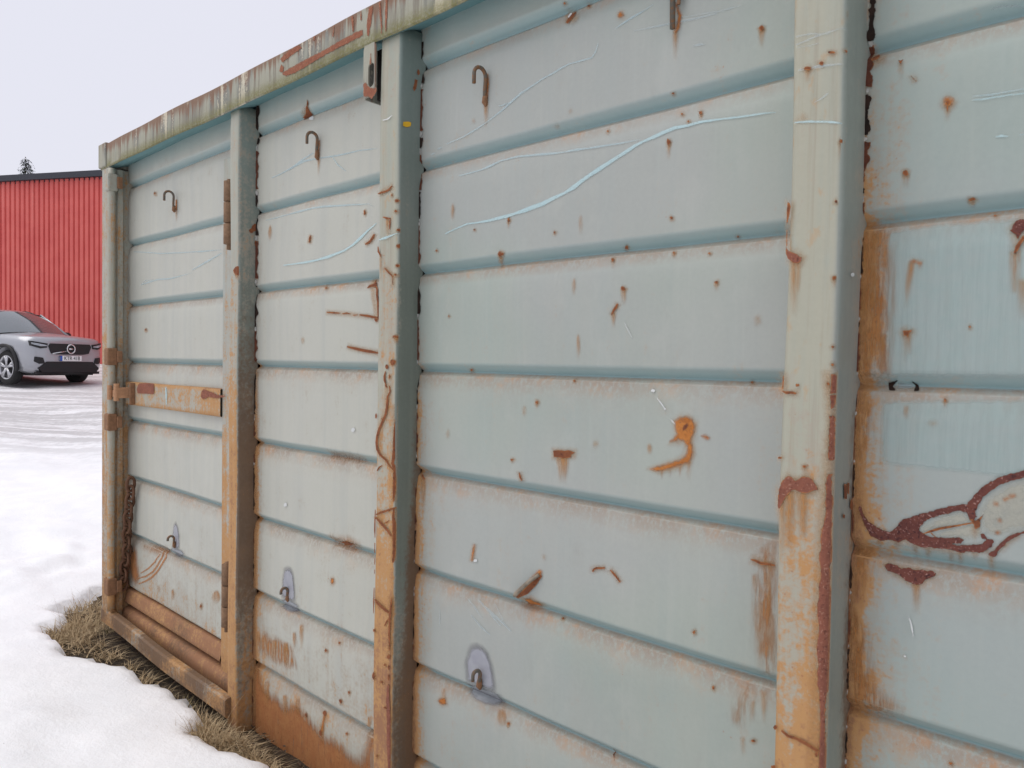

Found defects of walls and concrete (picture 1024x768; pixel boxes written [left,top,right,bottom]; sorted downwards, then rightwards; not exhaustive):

corrosion [367,0,388,36]
corrosion [859,231,885,374]
corrosion [653,417,709,471]
corrosion [858,470,1024,557]
corrosion [516,570,542,605]
corrosion [885,563,936,592]
corrosion [260,626,303,664]
corrosion [253,669,378,768]